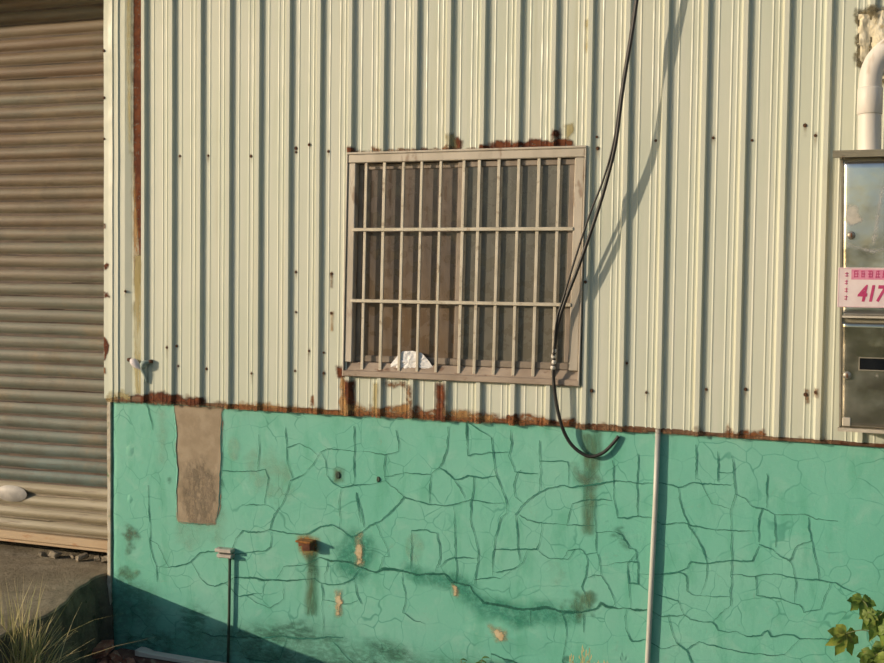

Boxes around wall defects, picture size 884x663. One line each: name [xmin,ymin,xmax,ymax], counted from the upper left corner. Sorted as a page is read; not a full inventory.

rust [127,0,141,334]
rust [347,124,573,153]
rust [107,345,648,433]
leakage [583,434,599,531]
rust [719,426,846,445]
crack [148,421,862,663]